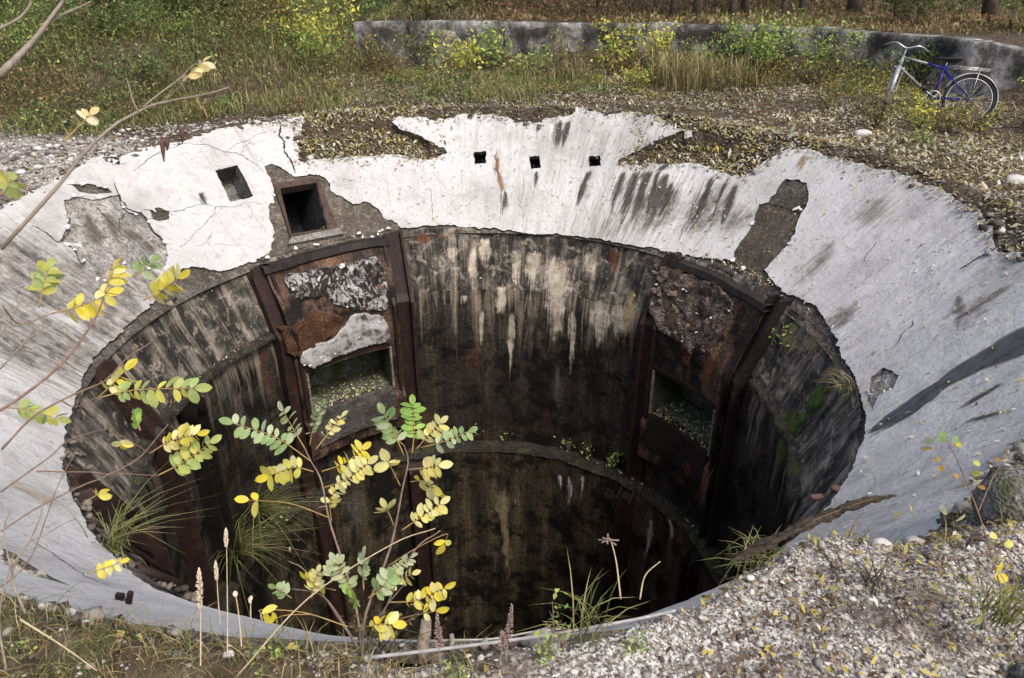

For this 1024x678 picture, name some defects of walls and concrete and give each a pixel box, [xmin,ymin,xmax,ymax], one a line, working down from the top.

spalling [20,140,173,282]
crack [99,122,296,249]
spalling [173,114,401,260]
leakage [576,171,591,204]
leakage [611,164,674,225]
leakage [691,177,737,229]
spalling [730,204,803,271]
spalling [954,199,1024,262]
leakage [461,238,490,304]
rust [277,309,343,357]
leakage [495,251,576,401]
spalling [867,370,898,409]